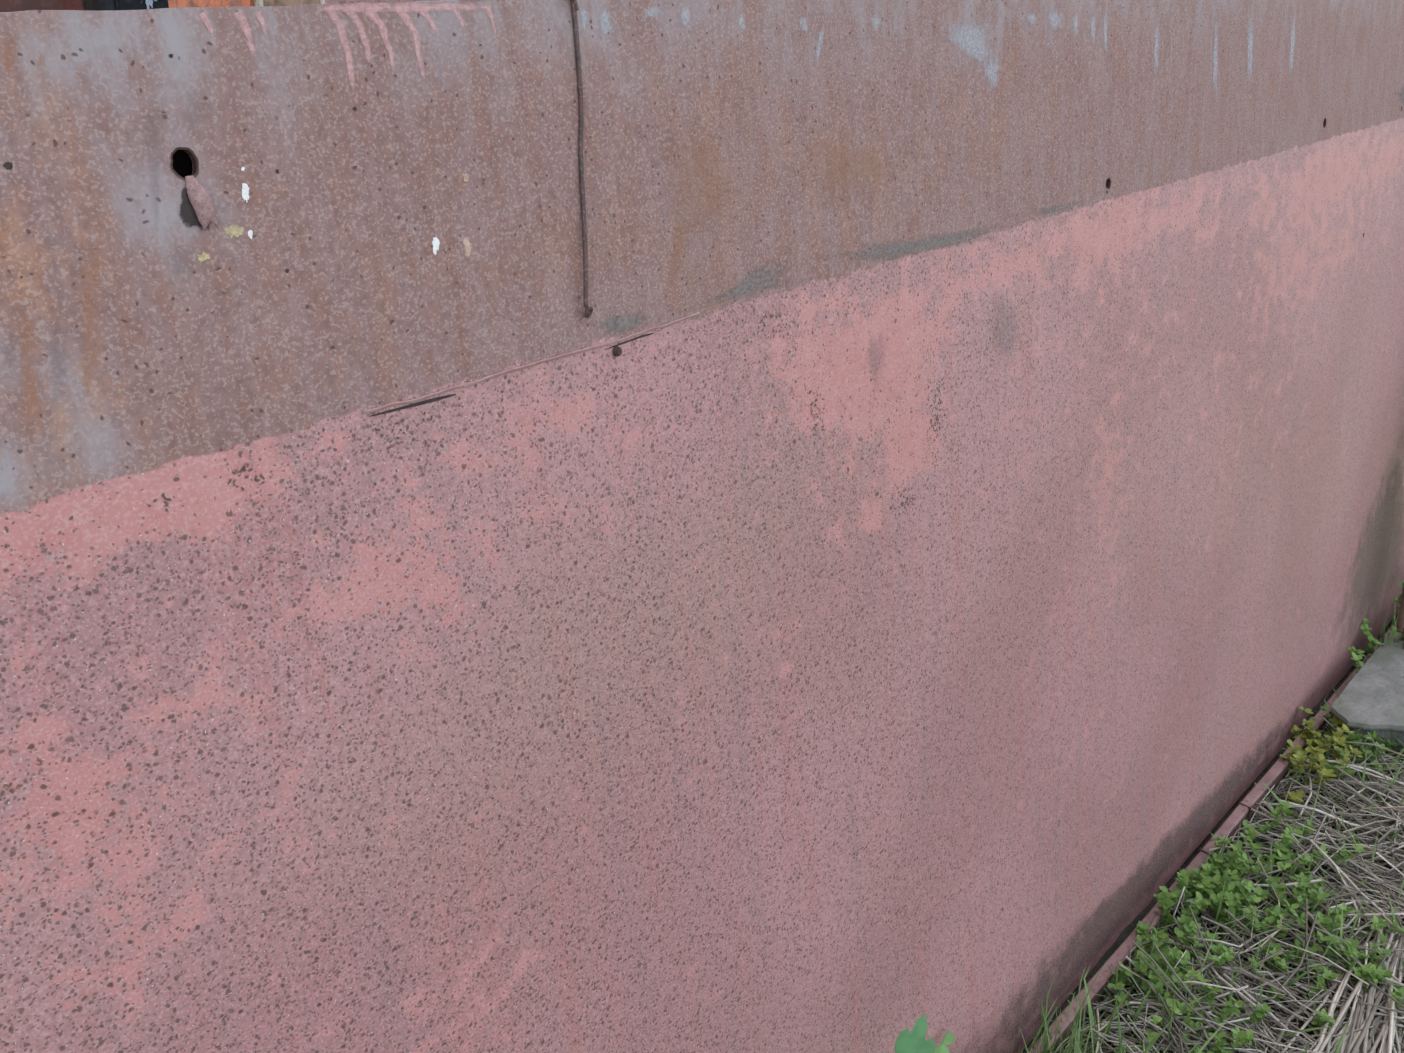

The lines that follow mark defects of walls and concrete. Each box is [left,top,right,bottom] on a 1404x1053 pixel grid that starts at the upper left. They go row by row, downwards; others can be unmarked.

leakage [234,11,265,53]
leakage [324,3,495,85]